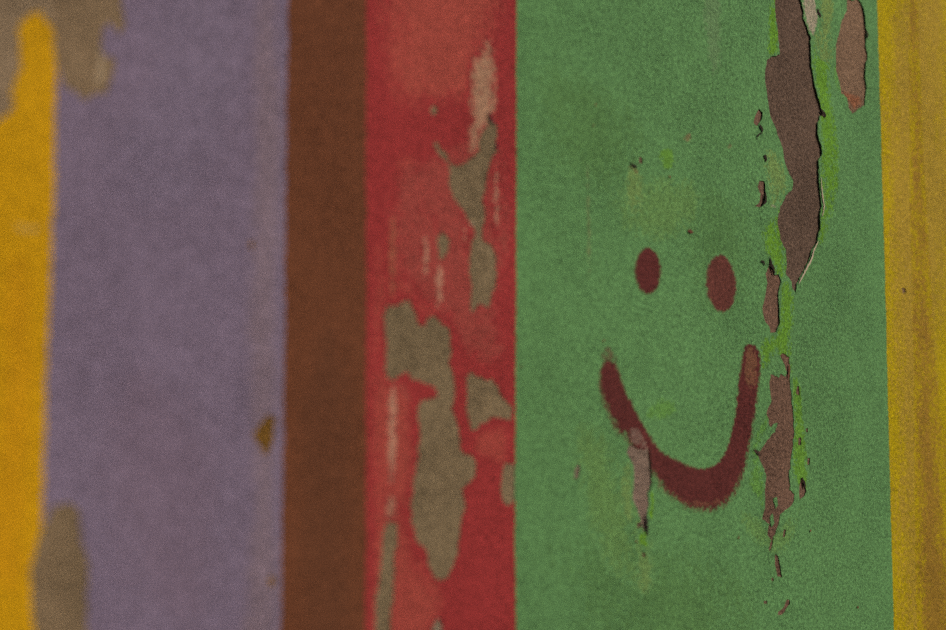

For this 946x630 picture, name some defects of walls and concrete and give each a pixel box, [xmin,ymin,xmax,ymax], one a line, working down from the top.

peeling [0,0,125,118]
peeling [434,113,498,312]
peeling [754,0,825,333]
peeling [836,0,867,114]
leakage [0,246,42,598]
peeling [375,521,398,630]
peeling [383,300,515,580]
peeling [755,353,808,581]